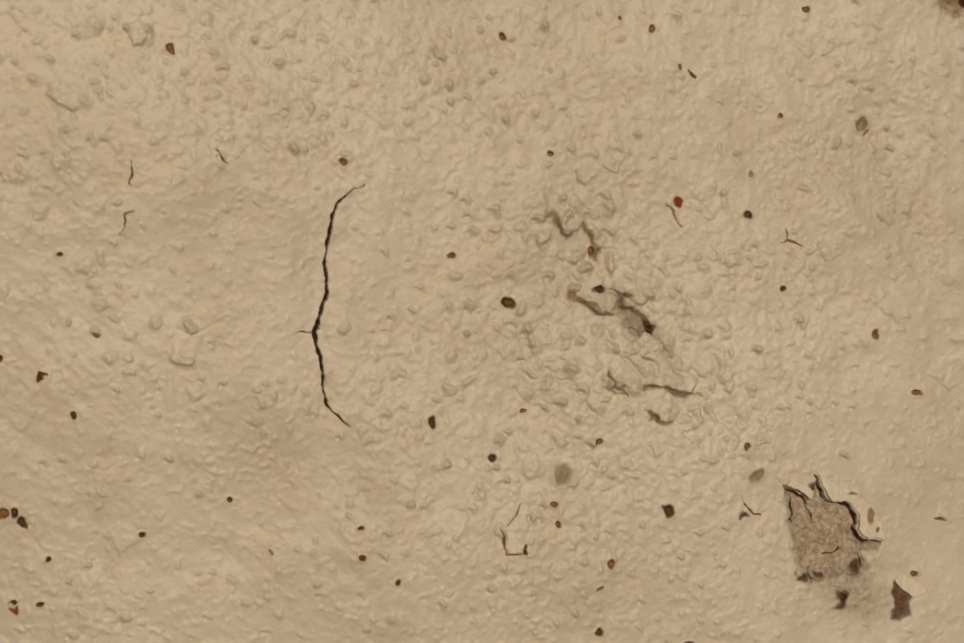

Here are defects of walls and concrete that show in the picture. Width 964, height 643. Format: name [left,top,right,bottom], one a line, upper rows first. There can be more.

crack [299,184,365,427]
peeling [783,474,886,582]
peeling [892,571,927,619]